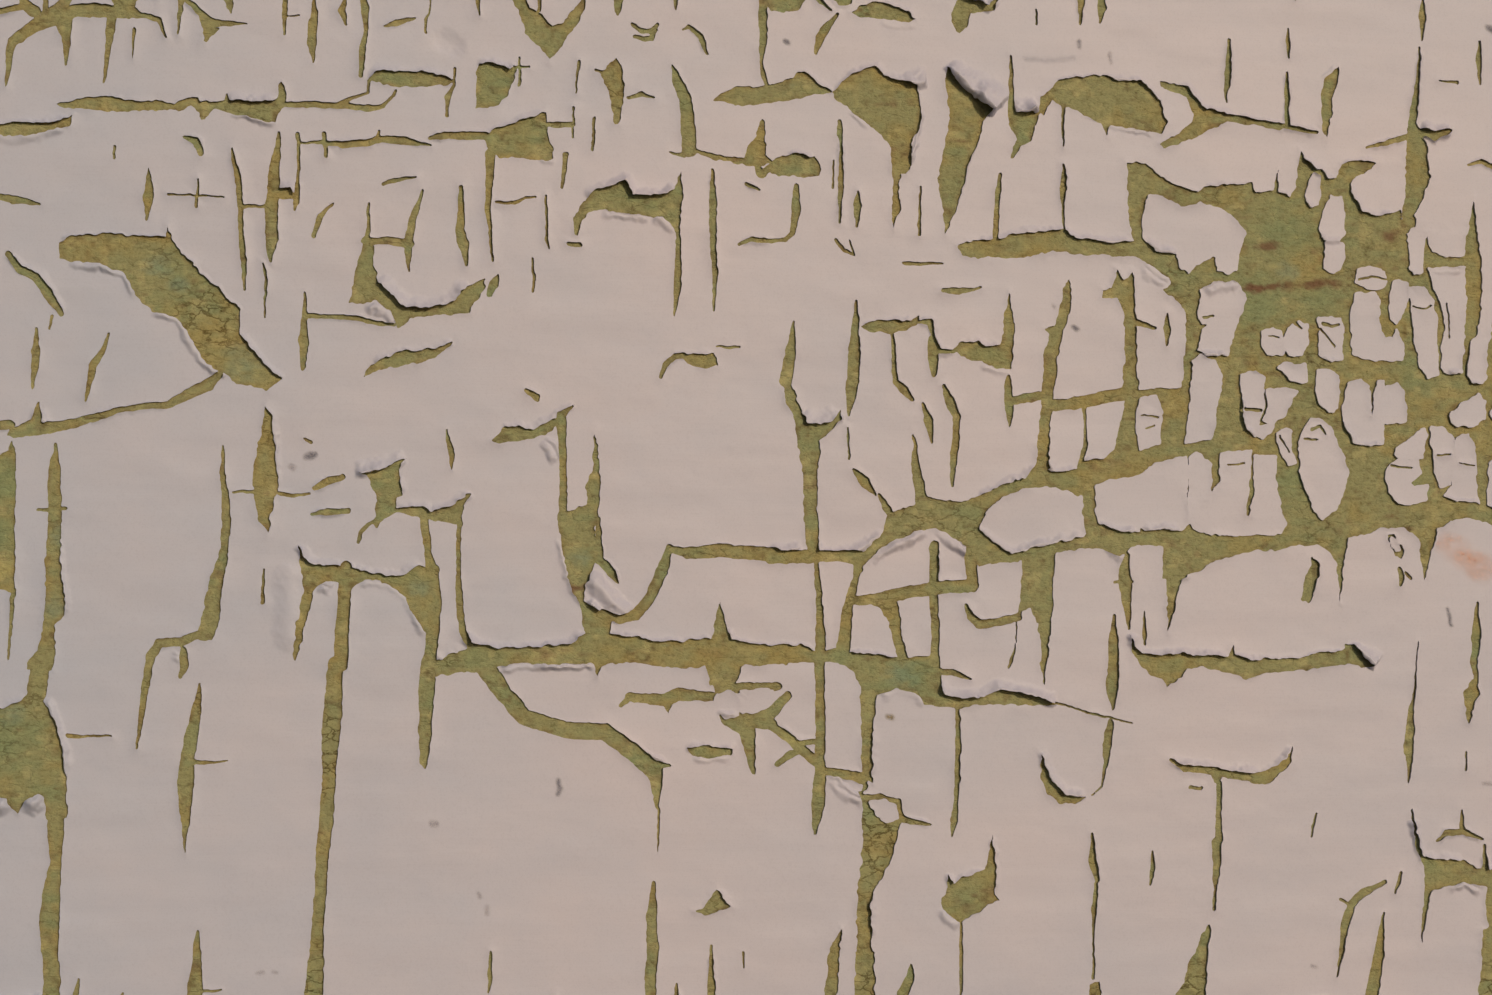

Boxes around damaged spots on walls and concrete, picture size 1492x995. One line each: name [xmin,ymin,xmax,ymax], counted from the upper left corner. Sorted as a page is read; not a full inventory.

peeling [59,168,283,391]
peeling [112,0,247,42]
peeling [337,67,576,328]
peeling [475,57,530,108]
peeling [513,0,585,59]
peeling [566,0,927,316]
peeling [951,0,998,33]
peeling [937,55,1167,233]
peeling [1321,67,1339,136]
peeling [232,152,1492,995]
peeling [0,441,112,995]
peeling [187,930,222,995]